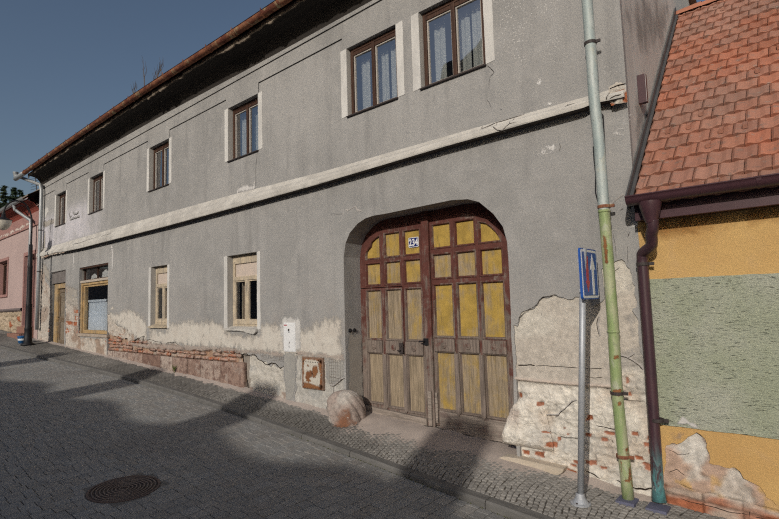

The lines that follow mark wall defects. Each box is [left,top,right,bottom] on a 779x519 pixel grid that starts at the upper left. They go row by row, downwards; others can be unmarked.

crack [481,65,524,134]
peeling [65,284,364,409]
flaking render [514,295,621,487]
flaking render [614,259,652,496]
flaking render [664,417,779,519]